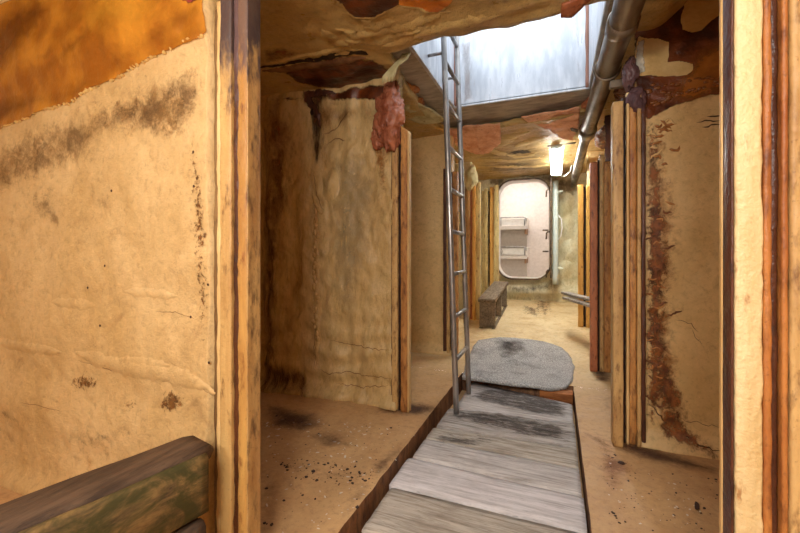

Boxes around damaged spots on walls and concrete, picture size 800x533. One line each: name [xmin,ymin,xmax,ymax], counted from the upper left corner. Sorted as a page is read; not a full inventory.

peeling [0,0,206,129]
peeling [634,0,720,119]
damp [55,128,91,156]
damp [116,85,193,128]
corrosion [641,0,734,533]
crack [313,313,388,389]
corrosion [161,390,182,411]